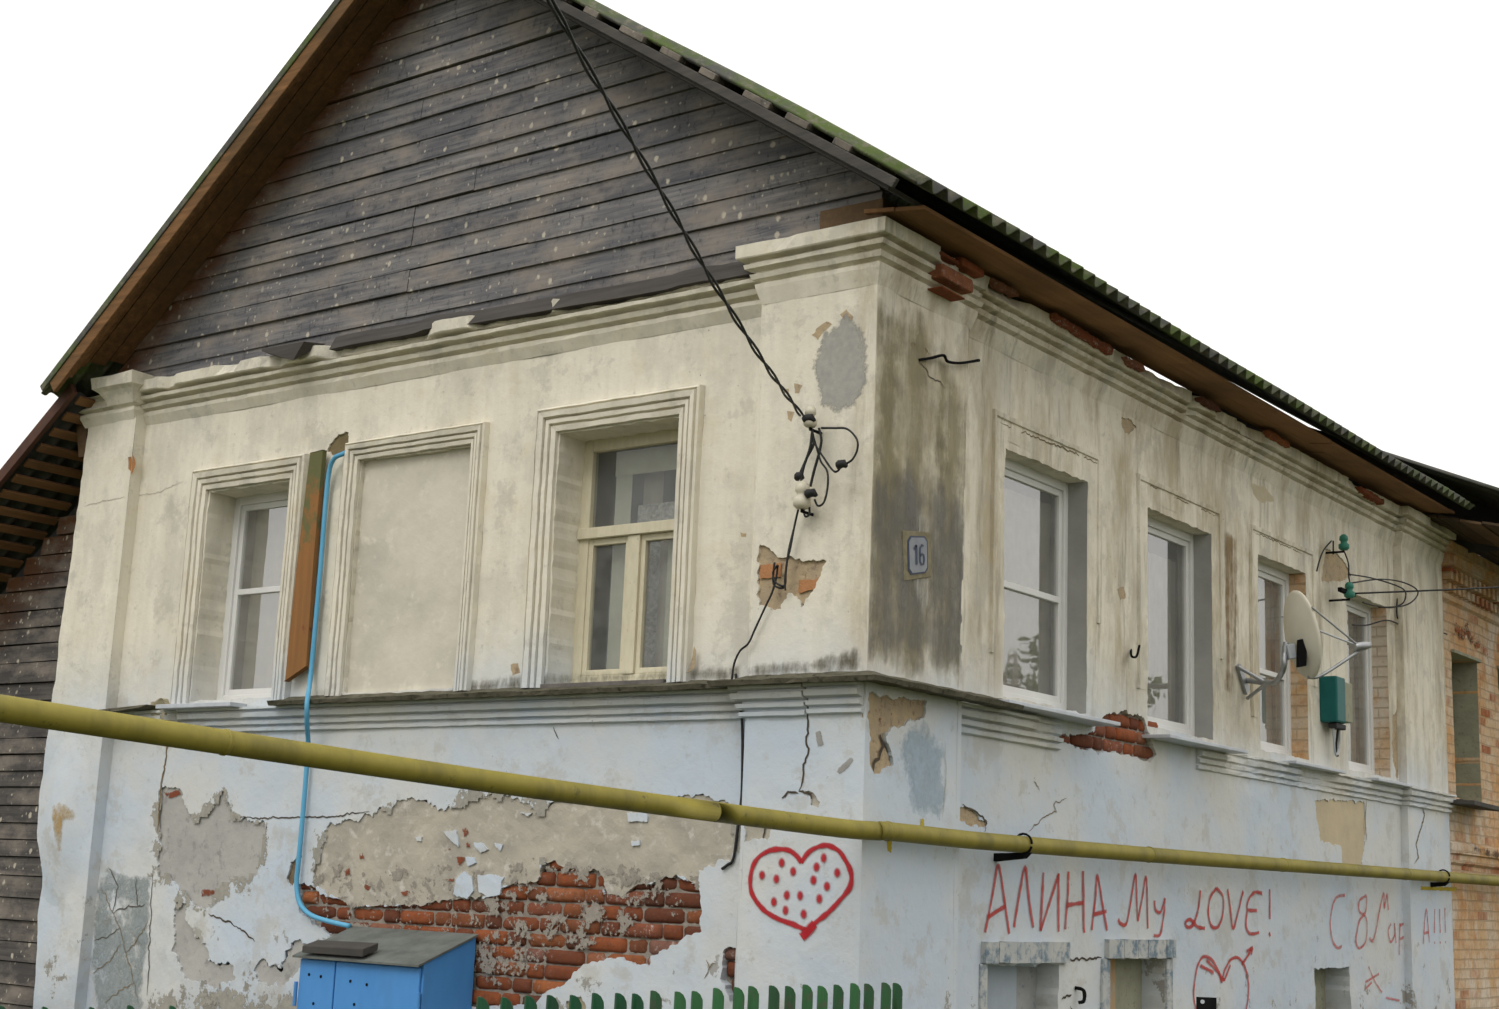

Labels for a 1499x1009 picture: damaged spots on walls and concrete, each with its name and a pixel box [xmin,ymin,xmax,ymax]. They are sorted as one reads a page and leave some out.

spalling [927,251,1019,302]
flaking render [786,309,867,411]
spalling [1049,313,1146,372]
leakage [871,312,966,669]
spalling [740,532,826,610]
leakage [805,652,857,670]
crack [157,747,168,830]
crack [782,699,812,798]
spalling [838,692,924,774]
spalling [1059,712,1158,761]
flaking render [148,786,306,1009]
flaking render [288,789,771,1009]